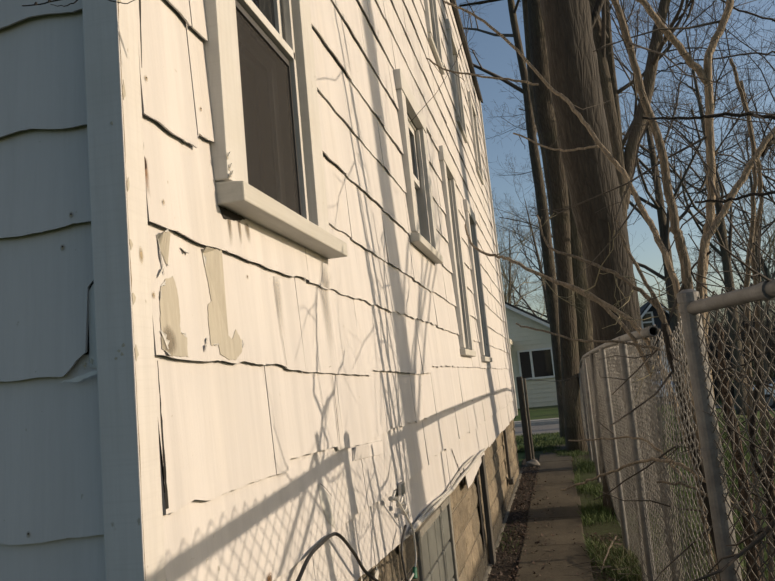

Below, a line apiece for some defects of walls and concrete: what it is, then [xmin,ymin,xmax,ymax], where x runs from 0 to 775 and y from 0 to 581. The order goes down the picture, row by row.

peeling [157,229,188,357]
peeling [202,247,244,360]